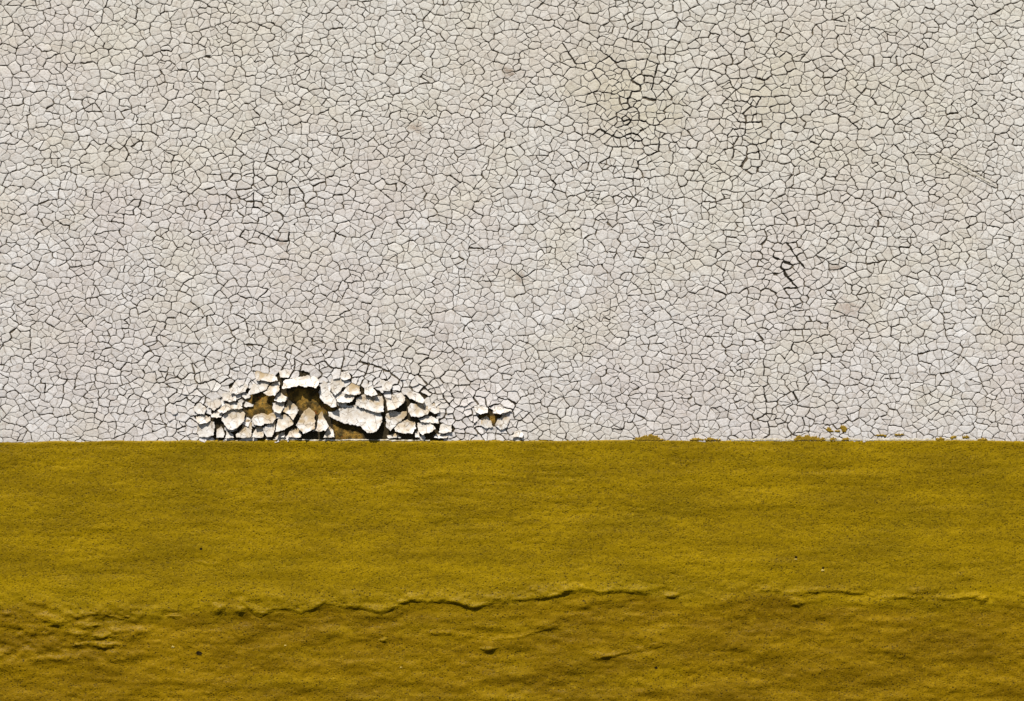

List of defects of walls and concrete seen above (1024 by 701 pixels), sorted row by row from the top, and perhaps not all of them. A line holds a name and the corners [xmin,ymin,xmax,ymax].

crack [0,0,1024,442]
peeling [190,368,457,441]
peeling [471,403,523,437]